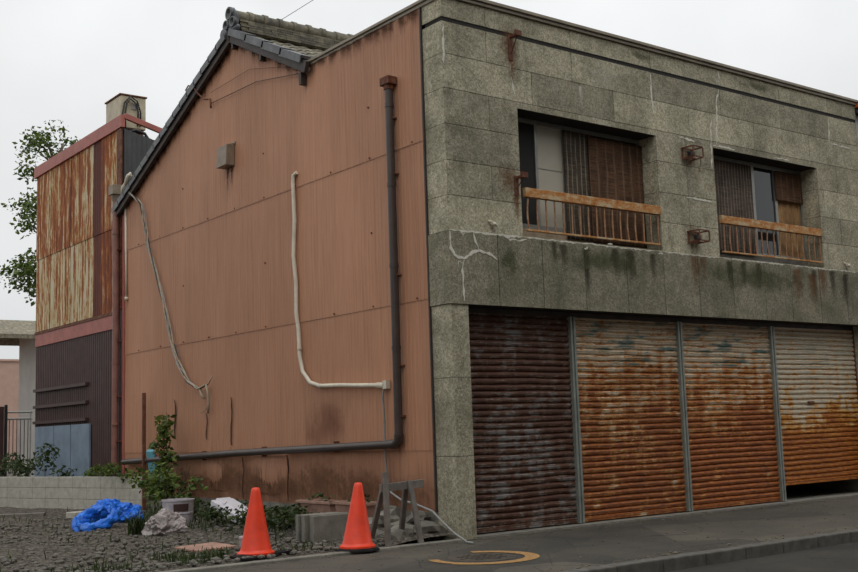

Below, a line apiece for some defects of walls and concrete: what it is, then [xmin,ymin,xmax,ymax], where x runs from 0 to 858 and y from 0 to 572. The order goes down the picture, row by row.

crack [449,231,497,301]